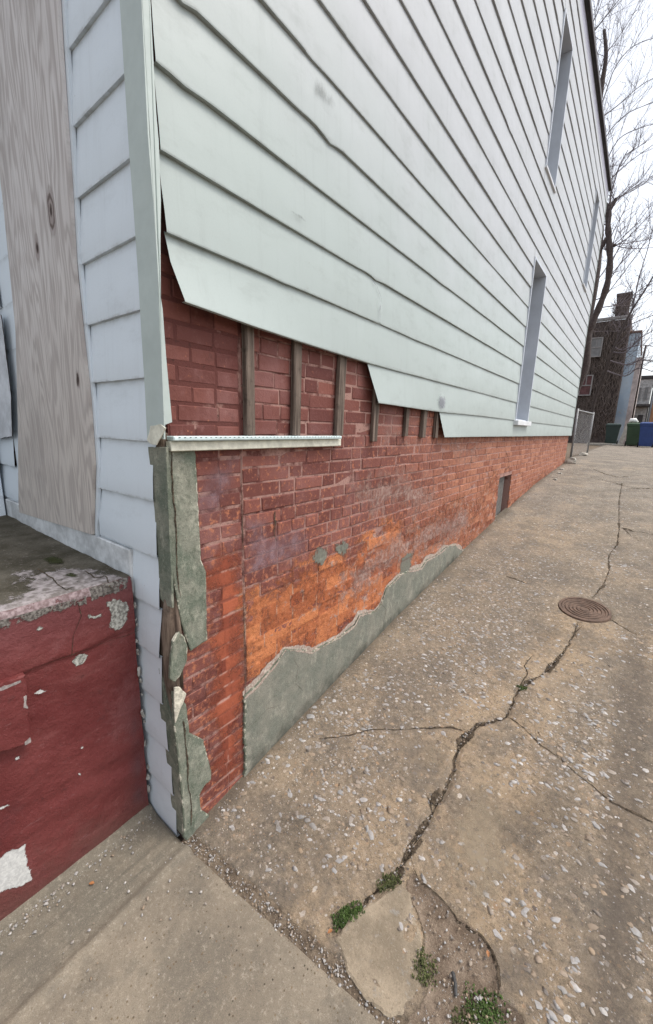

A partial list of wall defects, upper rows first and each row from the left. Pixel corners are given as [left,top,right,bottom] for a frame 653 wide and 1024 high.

peeling [0,568,129,630]
spalling [72,654,88,666]
peeling [148,446,548,841]
crack [321,624,653,933]
spalling [0,844,32,892]